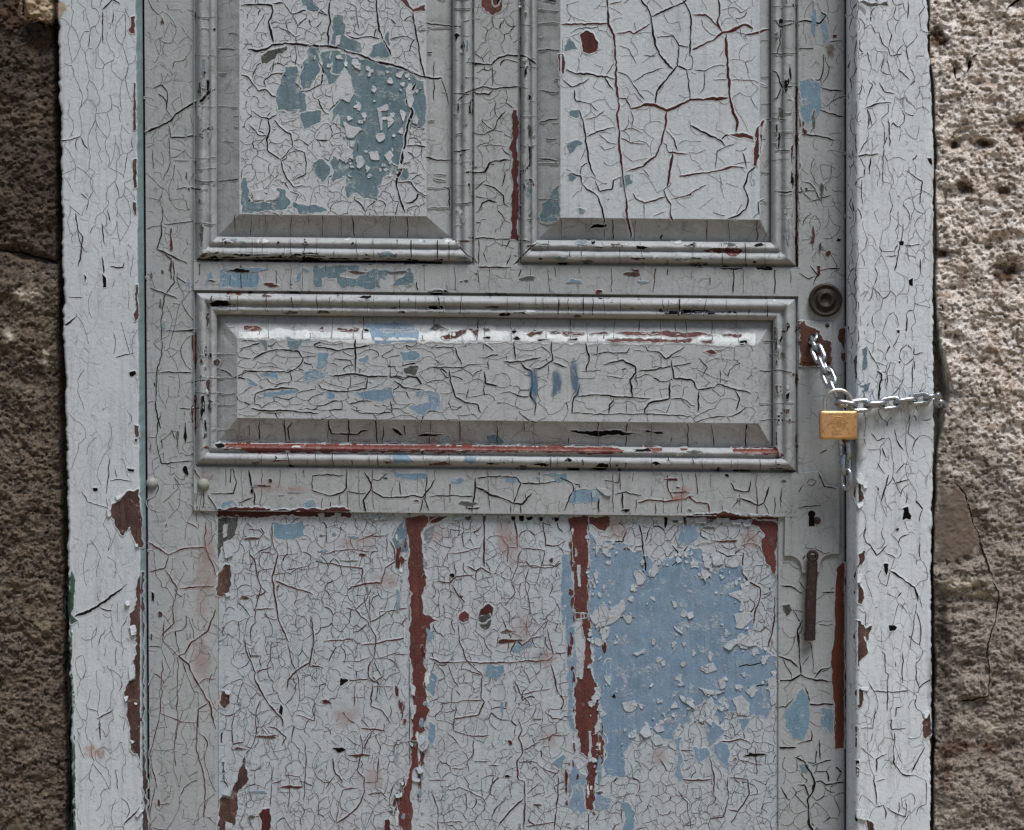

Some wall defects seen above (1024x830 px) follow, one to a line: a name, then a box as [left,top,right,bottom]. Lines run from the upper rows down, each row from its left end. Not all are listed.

crack [21,0,137,287]
crack [81,421,132,586]
crack [74,583,142,830]
crack [112,322,138,358]
peeling [107,488,145,549]
peeling [122,570,163,830]
peeling [259,13,428,202]
peeling [198,222,758,401]
peeling [175,345,877,830]
crack [143,0,933,830]
peeling [526,207,658,285]
crack [940,480,1001,703]